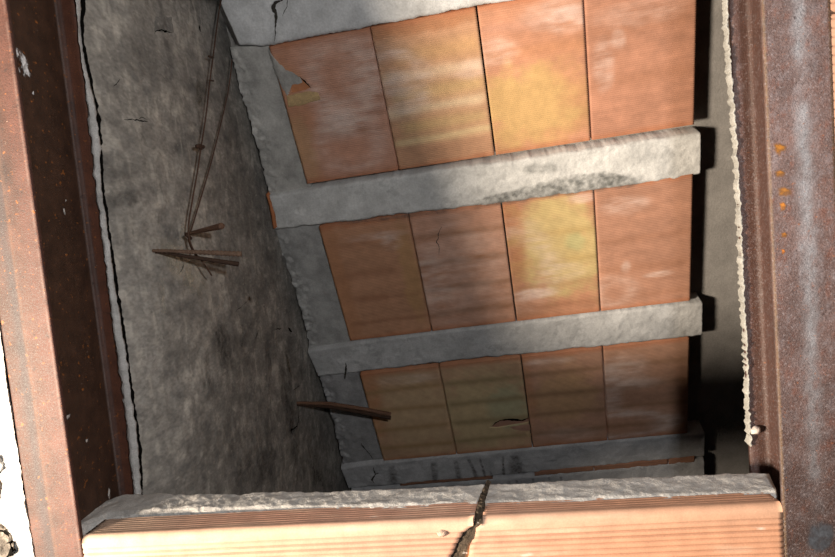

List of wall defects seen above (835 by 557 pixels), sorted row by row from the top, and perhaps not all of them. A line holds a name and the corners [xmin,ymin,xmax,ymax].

crack [271,0,288,41]
water stain [541,174,624,196]
crack [451,480,491,557]
spalling [0,523,16,557]